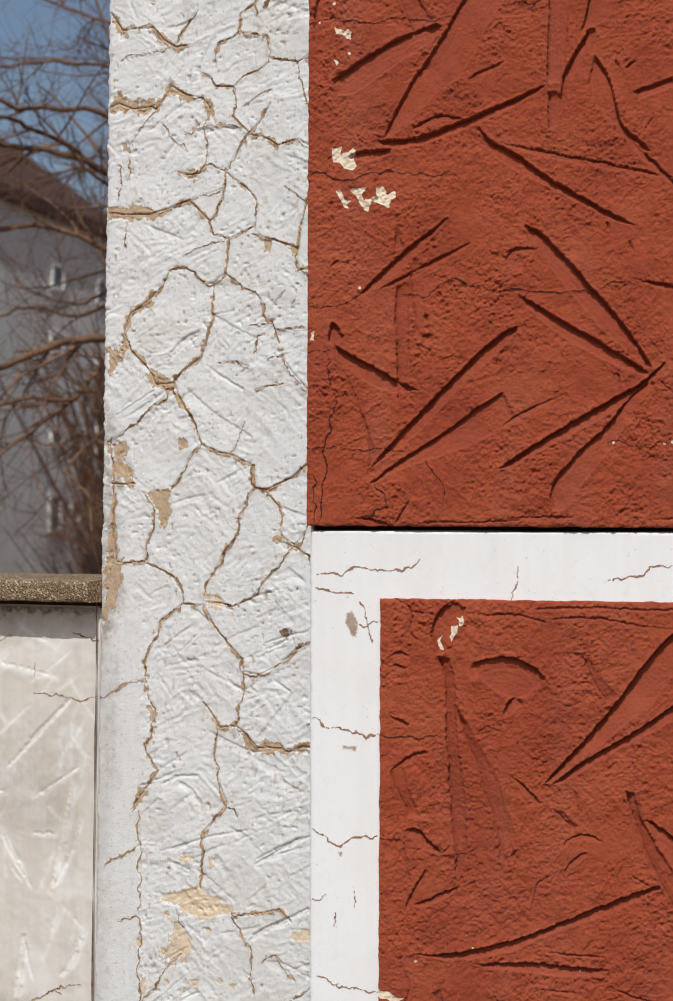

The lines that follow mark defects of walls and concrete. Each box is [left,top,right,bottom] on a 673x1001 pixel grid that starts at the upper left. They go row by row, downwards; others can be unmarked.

spalling [332,147,357,170]
spalling [336,186,396,211]
peeling [111,441,172,529]
crack [31,0,457,1001]
peeling [101,523,125,628]
crack [609,565,672,581]
spalling [437,616,464,650]
peeling [154,885,233,968]